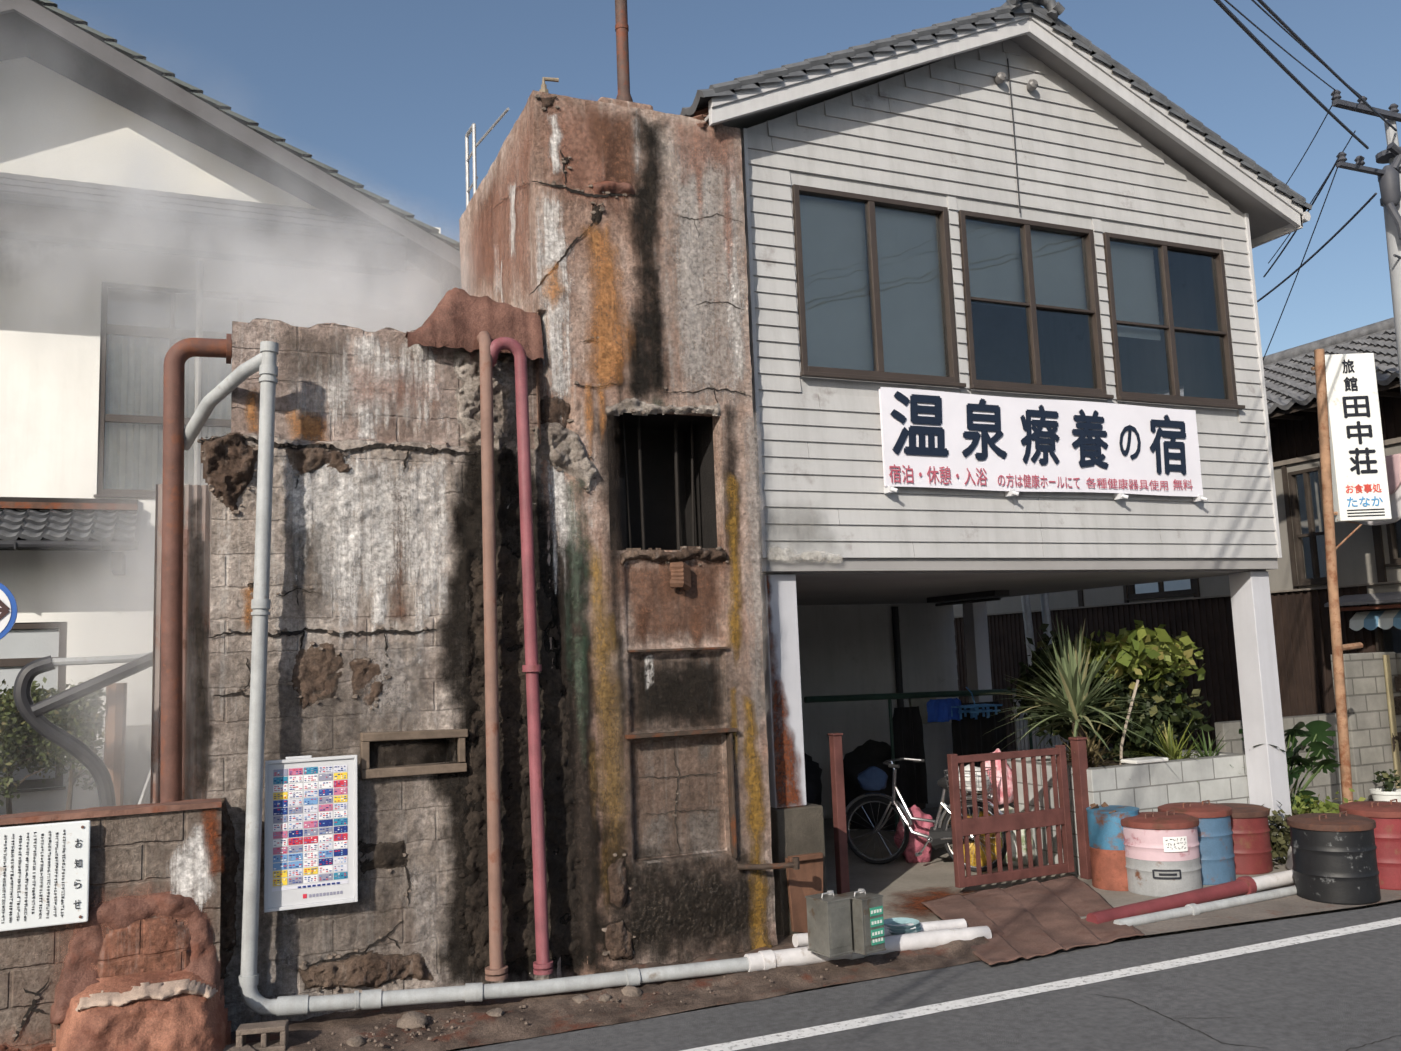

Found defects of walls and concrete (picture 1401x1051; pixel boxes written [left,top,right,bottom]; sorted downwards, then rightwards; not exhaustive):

crack [491,150,743,295]
spalling [200,432,258,514]
spalling [285,443,352,480]
crack [197,433,477,489]
leakage [284,111,802,984]
crack [208,584,436,697]
spalling [287,641,392,710]
spalling [297,950,434,992]